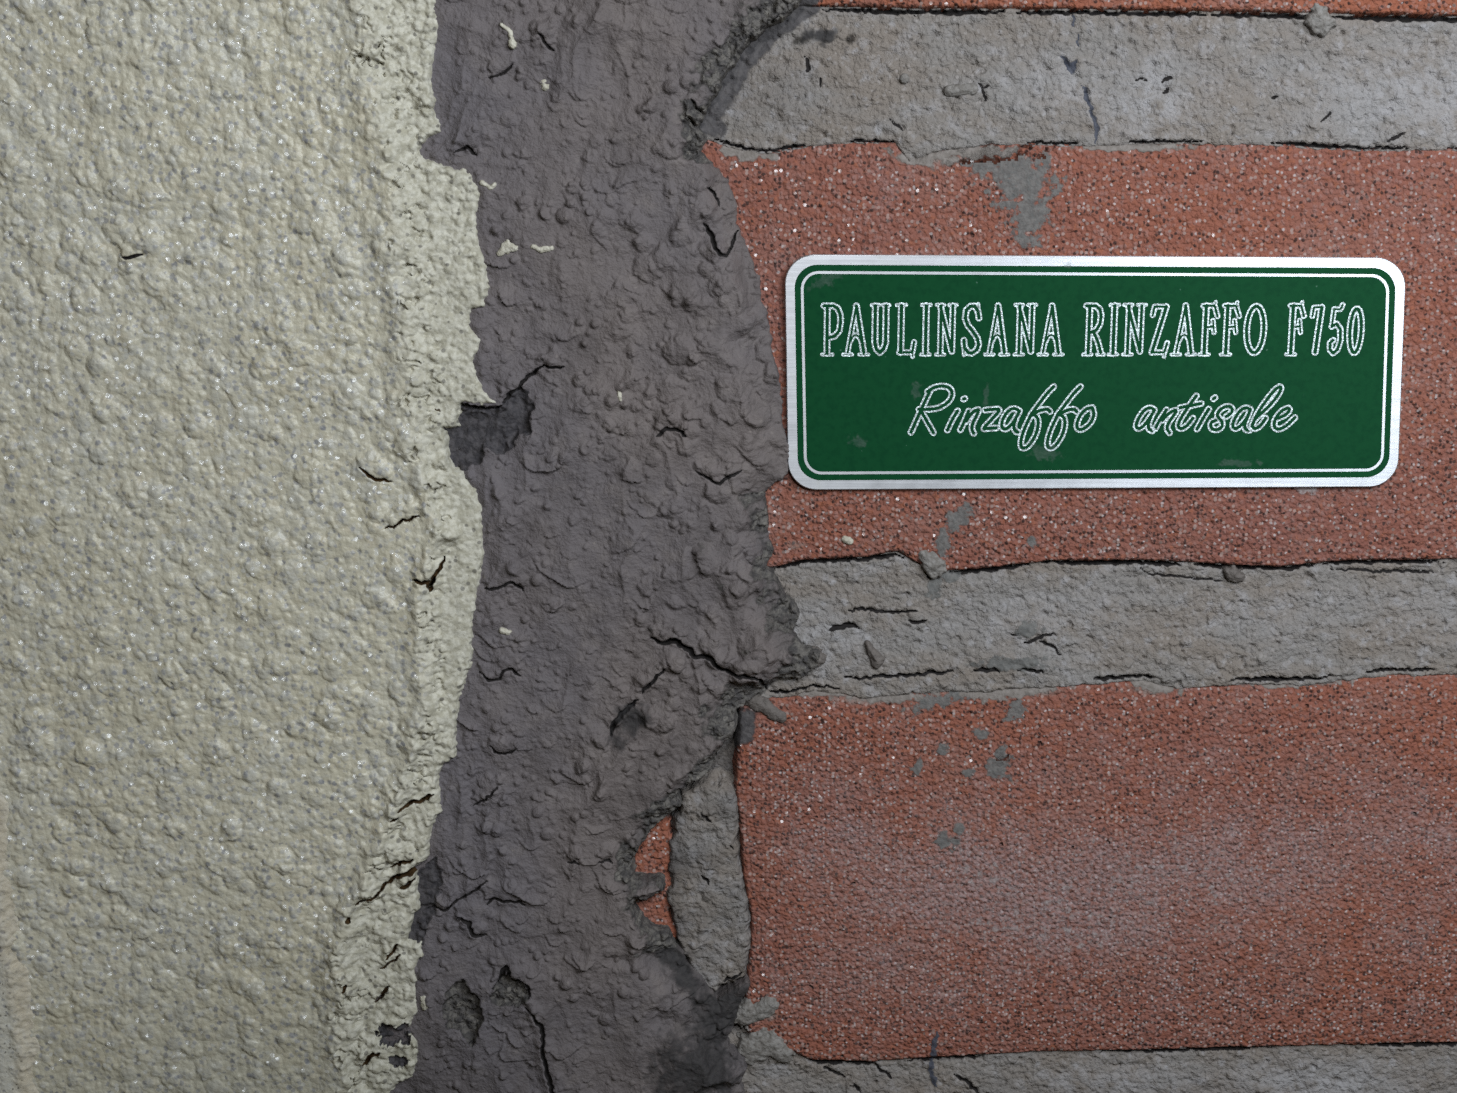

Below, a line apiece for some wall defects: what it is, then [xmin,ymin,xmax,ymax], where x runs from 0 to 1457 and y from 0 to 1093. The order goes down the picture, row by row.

spalling [679,0,803,163]
crack [822,7,1457,150]
crack [694,101,805,153]
spalling [444,388,535,470]
crack [414,556,446,592]
crack [774,553,1444,631]
spalling [614,490,820,957]
crack [610,633,1062,736]
crack [1230,667,1435,683]
crack [390,794,434,822]
crack [345,859,526,938]
spalling [443,973,530,1047]